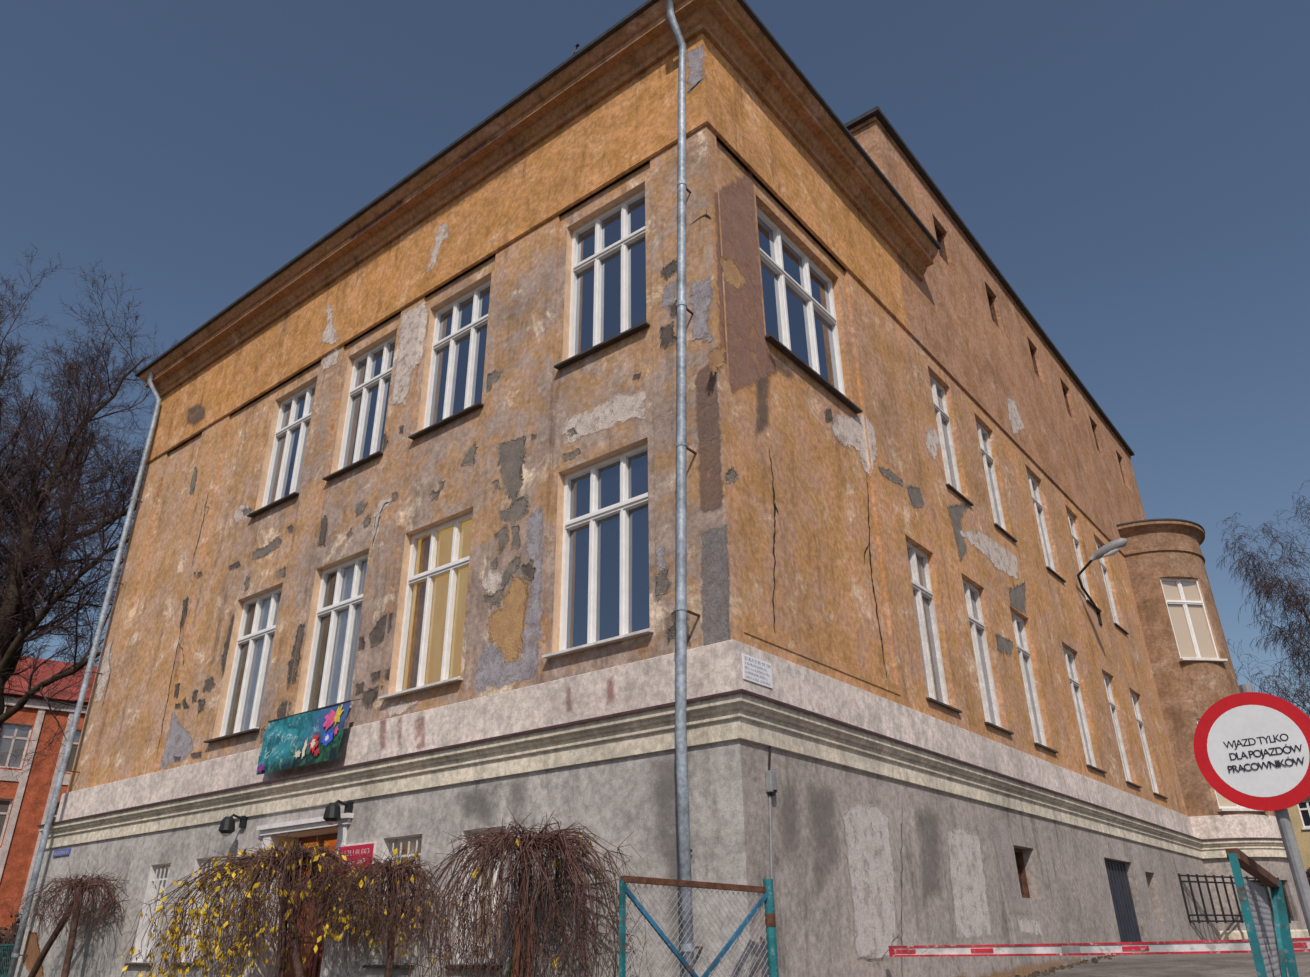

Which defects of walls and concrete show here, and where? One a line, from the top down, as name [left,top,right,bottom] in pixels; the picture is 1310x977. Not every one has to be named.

peeling [425,223,449,272]
peeling [390,302,428,405]
peeling [562,372,647,461]
flaking render [724,467,739,485]
flaking render [482,436,537,663]
crack [769,450,779,630]